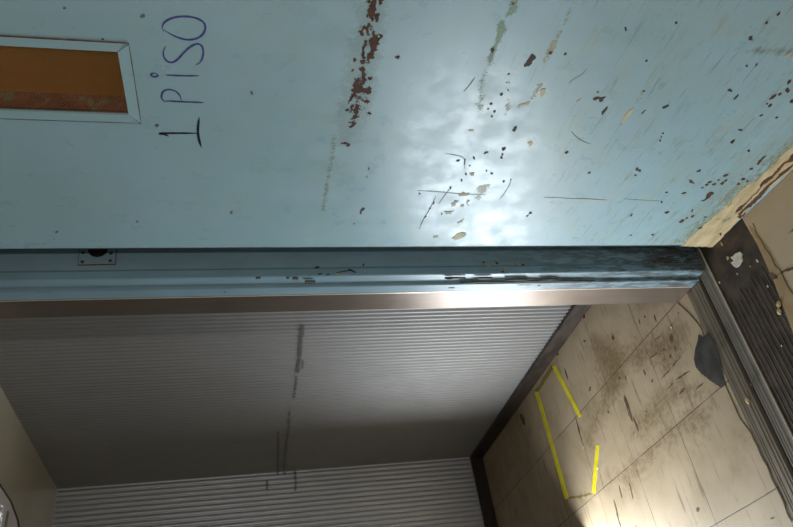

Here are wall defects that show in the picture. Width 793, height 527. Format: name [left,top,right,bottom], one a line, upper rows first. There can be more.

rust [346,0,384,128]
leakage [488,0,518,62]
spalling [524,12,570,67]
peeling [674,144,793,248]
spalling [445,261,595,288]
peeling [668,302,793,522]